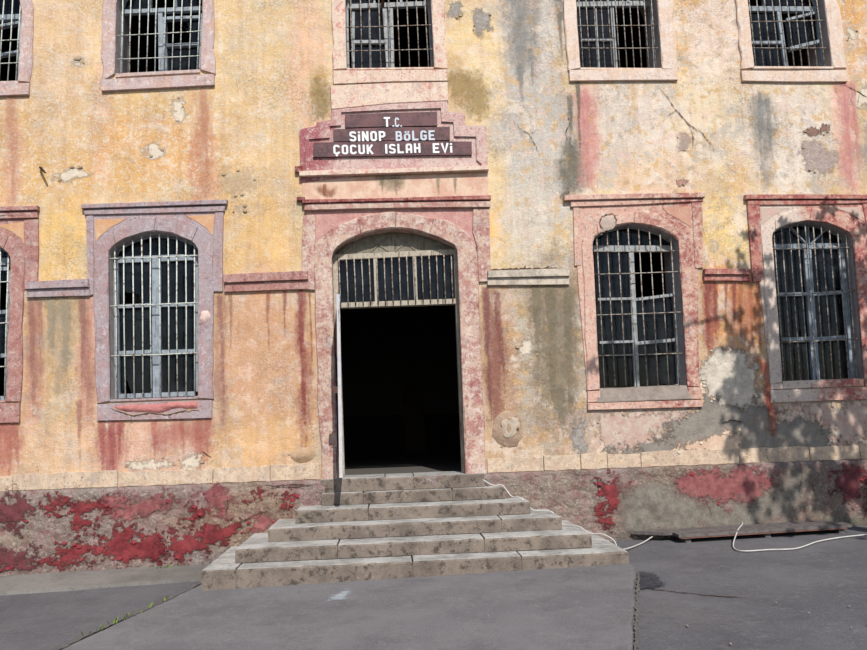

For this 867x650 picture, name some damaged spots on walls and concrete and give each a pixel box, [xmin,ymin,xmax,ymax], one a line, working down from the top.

damp [508,0,535,86]
peeling [51,165,91,182]
peeling [138,143,166,160]
damp [559,82,581,196]
rust [705,283,760,343]
damp [532,285,575,419]
spalling [699,345,766,412]
spalling [570,407,693,454]
spalling [777,400,867,446]
peeling [670,427,780,513]
peeling [827,462,867,517]
peeling [0,482,300,575]